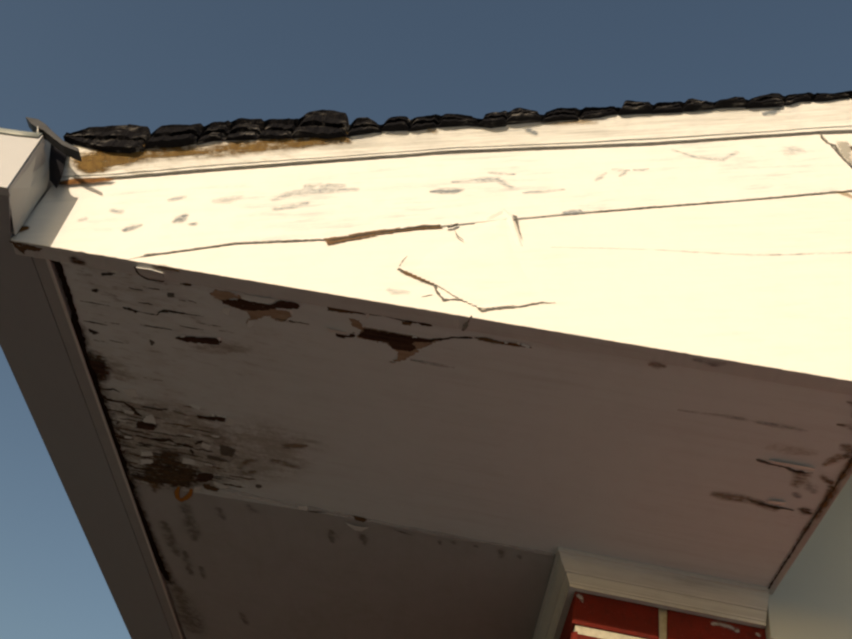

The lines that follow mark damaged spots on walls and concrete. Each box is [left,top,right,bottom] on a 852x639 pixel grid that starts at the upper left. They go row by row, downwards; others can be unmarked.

crack [818,132,852,166]
crack [585,190,852,212]
crack [134,239,314,282]
peeling [210,289,309,328]
peeling [141,322,232,345]
peeling [326,307,532,364]
peeling [108,404,262,489]